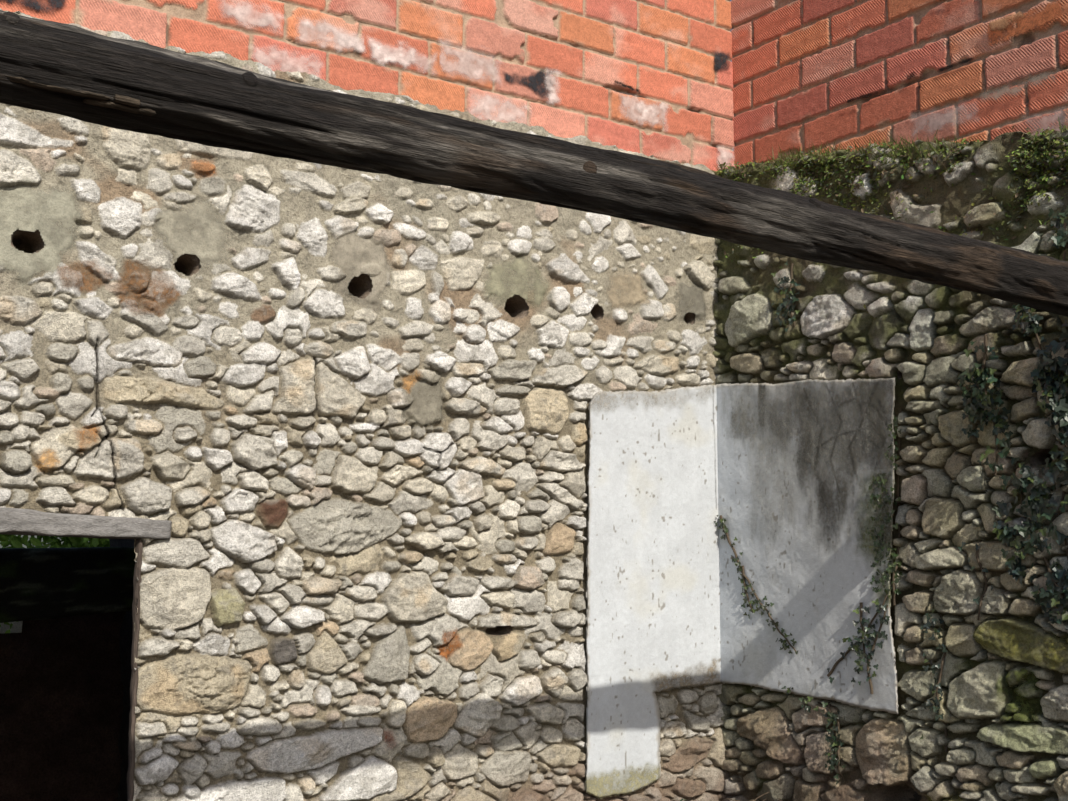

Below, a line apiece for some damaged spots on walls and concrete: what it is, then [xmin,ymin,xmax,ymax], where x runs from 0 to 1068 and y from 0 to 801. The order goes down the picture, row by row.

crack [91,340,124,511]
water stain [732,378,895,541]